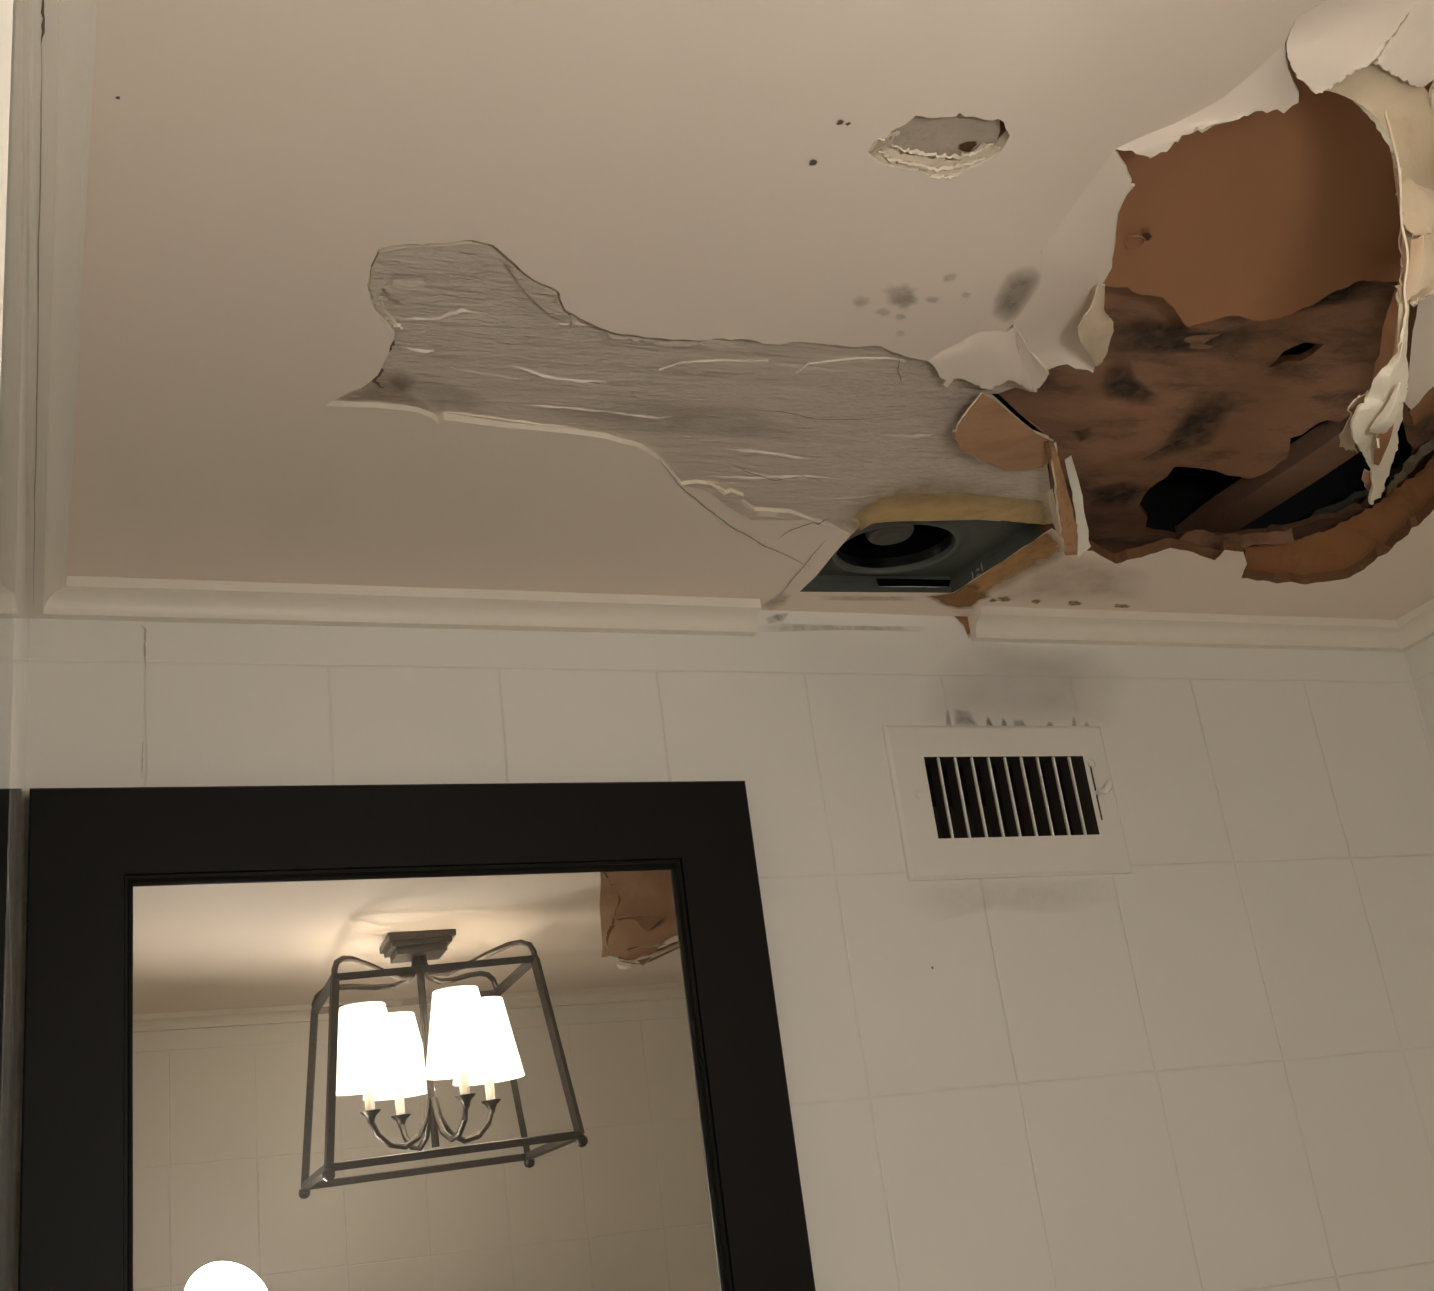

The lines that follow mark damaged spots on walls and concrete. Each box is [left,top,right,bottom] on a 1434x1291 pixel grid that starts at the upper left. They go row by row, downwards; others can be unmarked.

spalling [868,113,1006,179]
damp [857,488,1045,530]